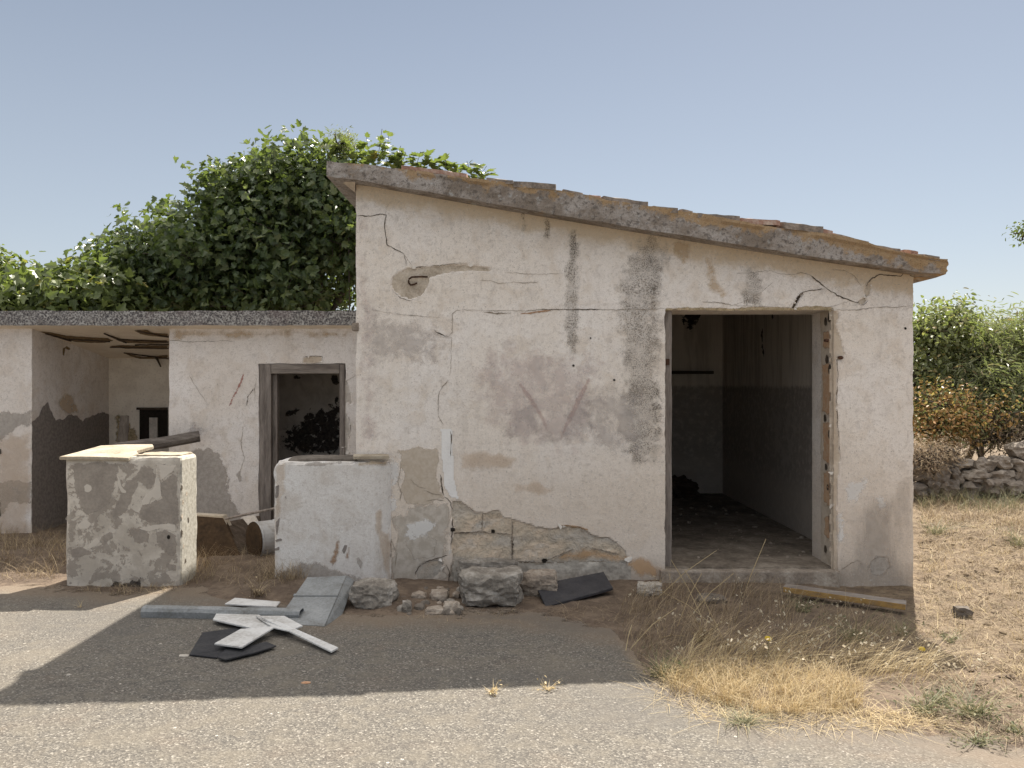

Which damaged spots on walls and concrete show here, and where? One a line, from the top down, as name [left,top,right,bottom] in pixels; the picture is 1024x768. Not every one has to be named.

crack [359,213,455,268]
damp [566,236,578,348]
damp [620,241,662,463]
crack [710,270,913,310]
crack [374,292,665,581]
spalling [666,306,844,570]
flaking render [65,462,189,587]
flaking render [392,447,452,579]